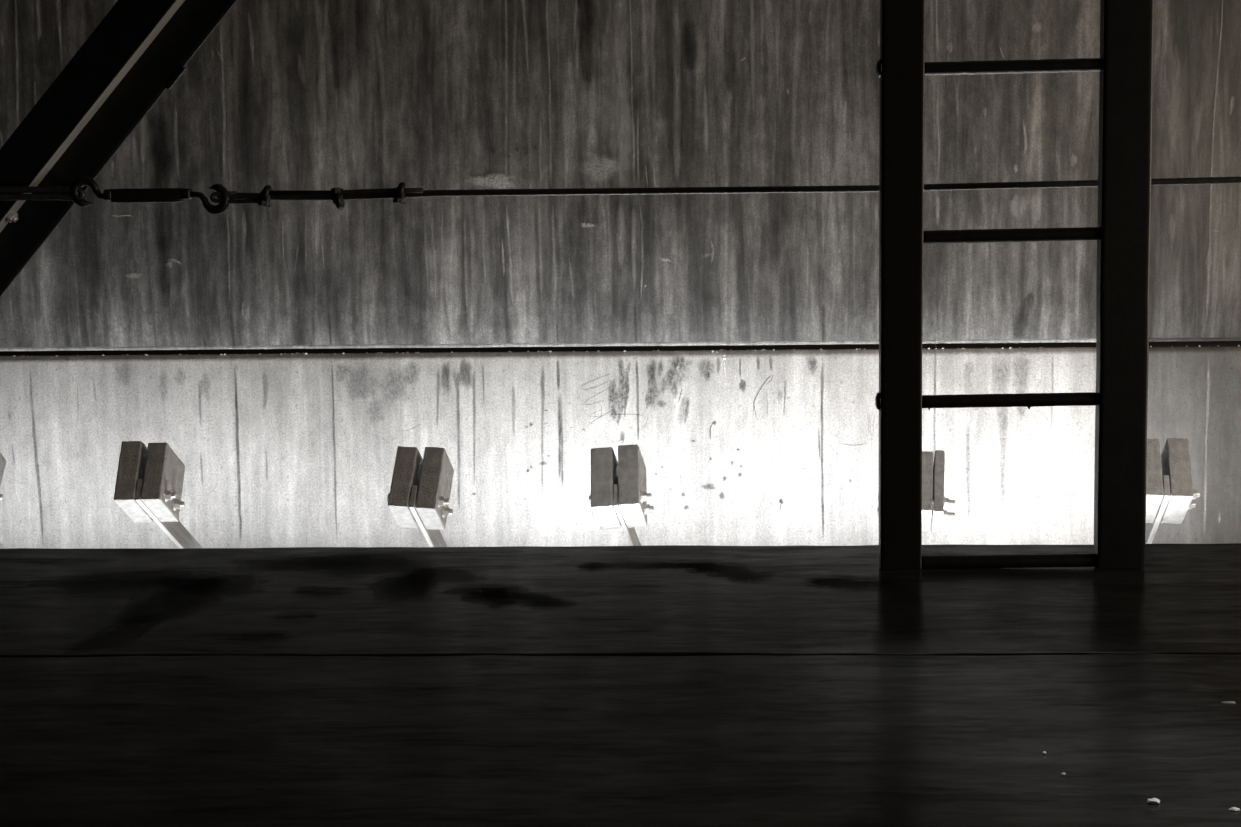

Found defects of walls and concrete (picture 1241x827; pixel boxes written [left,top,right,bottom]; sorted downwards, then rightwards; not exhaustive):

leakage [609,359,684,423]